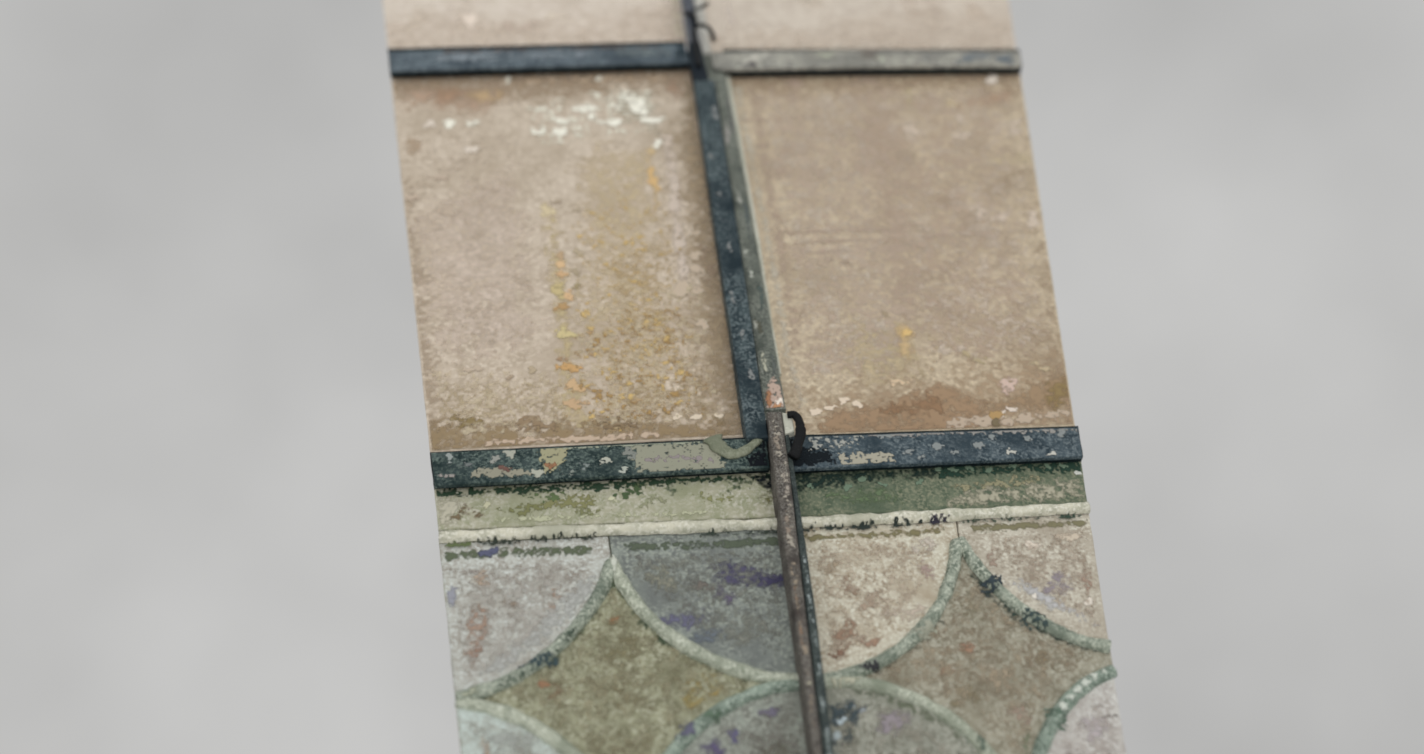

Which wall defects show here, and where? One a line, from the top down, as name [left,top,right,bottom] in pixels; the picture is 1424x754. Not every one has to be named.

corrosion [550,166,709,431]
peeling [868,429,1077,438]